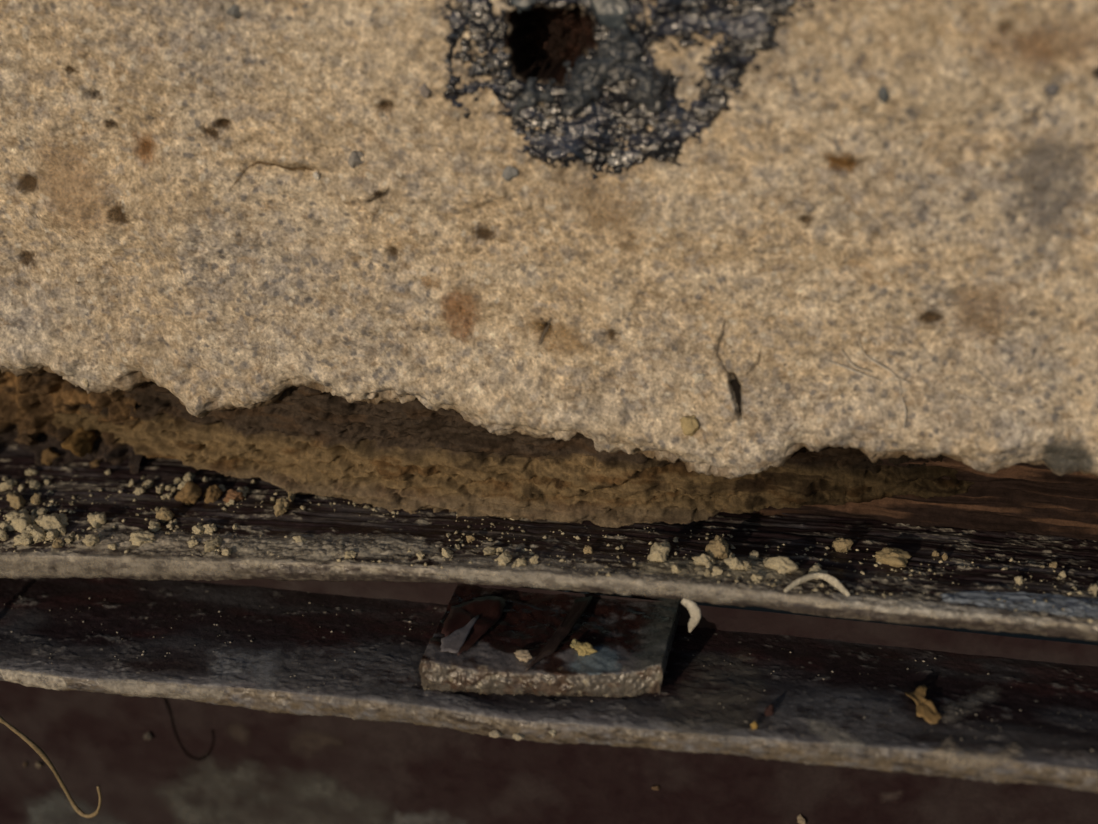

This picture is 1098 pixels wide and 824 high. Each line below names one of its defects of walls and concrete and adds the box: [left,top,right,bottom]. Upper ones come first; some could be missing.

spalling [0,370,143,474]
spalling [756,456,1098,541]
damp [170,764,430,824]